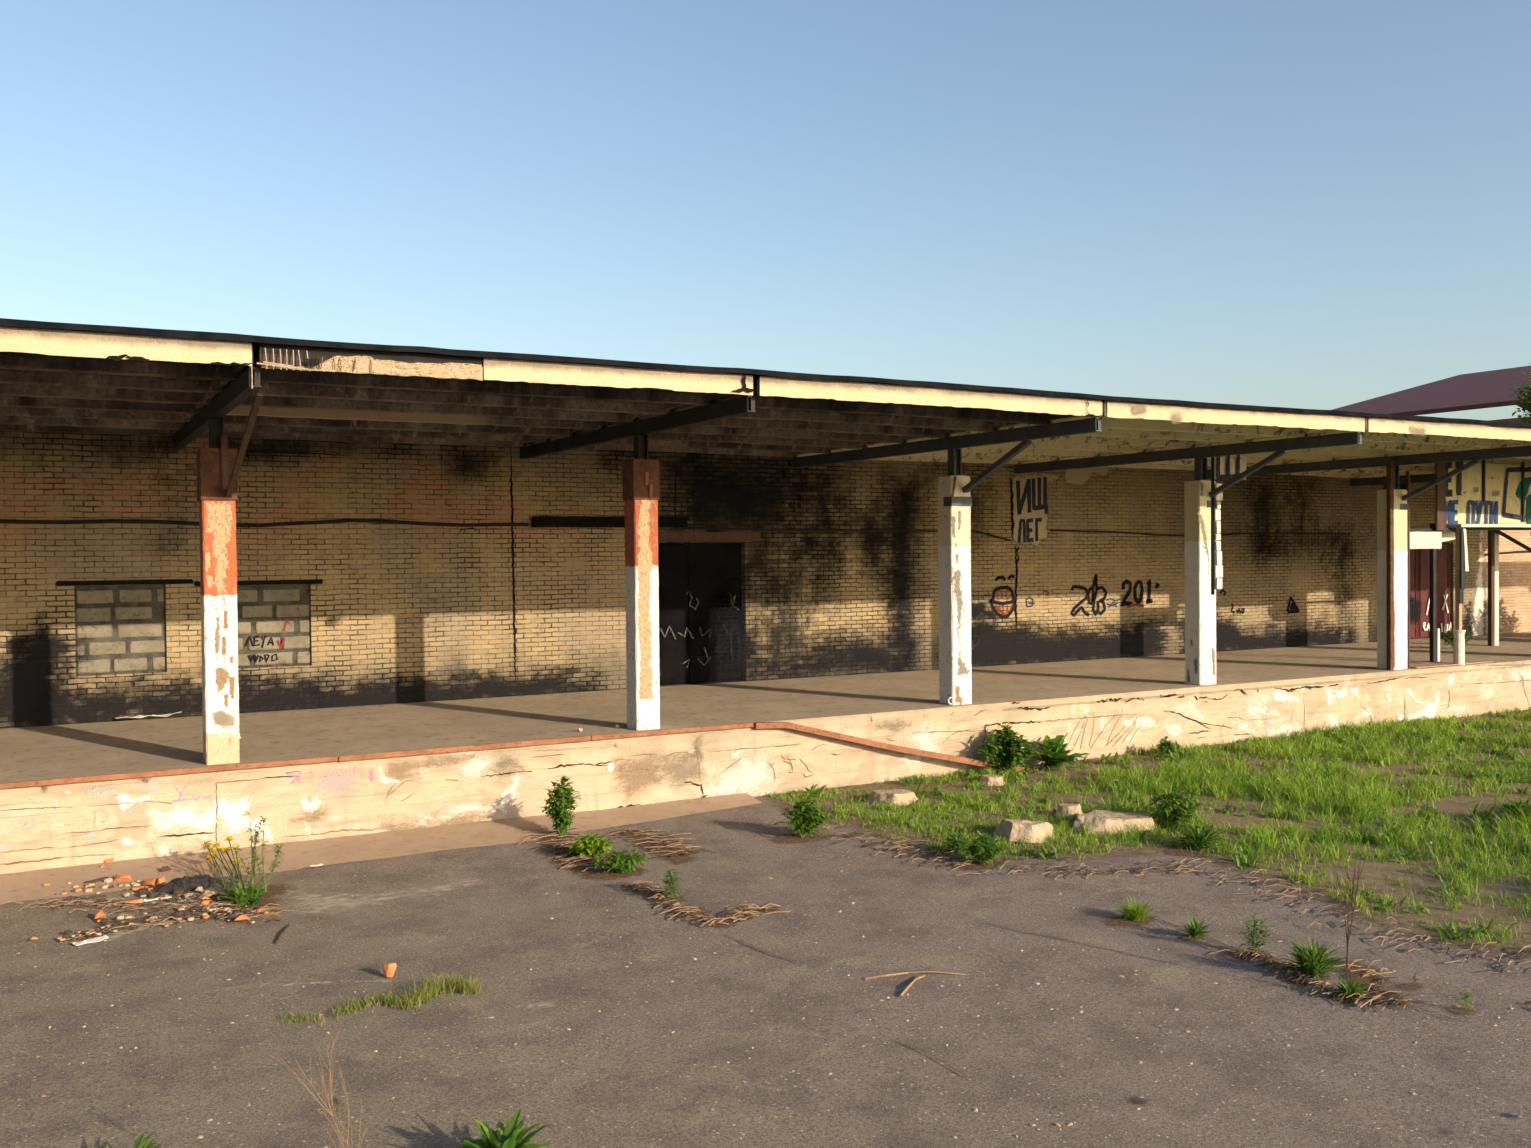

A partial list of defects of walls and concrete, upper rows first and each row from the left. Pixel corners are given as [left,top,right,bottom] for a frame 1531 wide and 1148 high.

spalling [257,348,483,381]
leakage [788,464,890,609]
peeling [205,501,236,707]
leakage [0,611,607,729]
peeling [637,500,653,700]
leakage [716,627,907,682]
peeling [952,511,970,704]
leakage [300,796,321,834]
leakage [378,754,521,831]